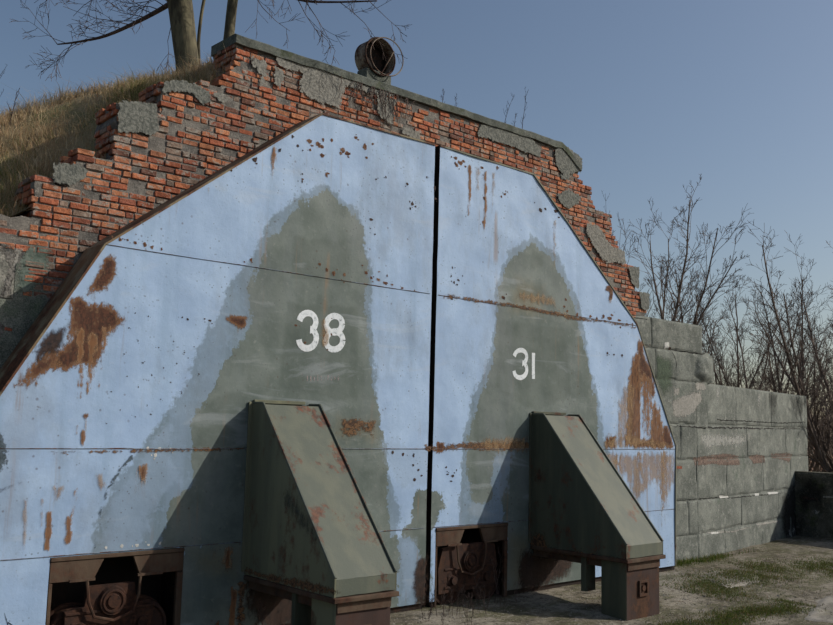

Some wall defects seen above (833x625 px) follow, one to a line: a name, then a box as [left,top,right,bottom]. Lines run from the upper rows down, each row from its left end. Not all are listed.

flaking render [162,80,232,105]
flaking render [117,100,159,137]
flaking render [478,125,541,157]
flaking render [53,162,88,187]
flaking render [534,146,583,218]
flaking render [586,223,650,311]
corrosion [14,254,125,393]
corrosion [447,293,636,329]
corrosion [341,418,376,437]
corrosion [605,340,674,502]
corrosion [425,439,529,454]
corrosion [44,511,52,551]